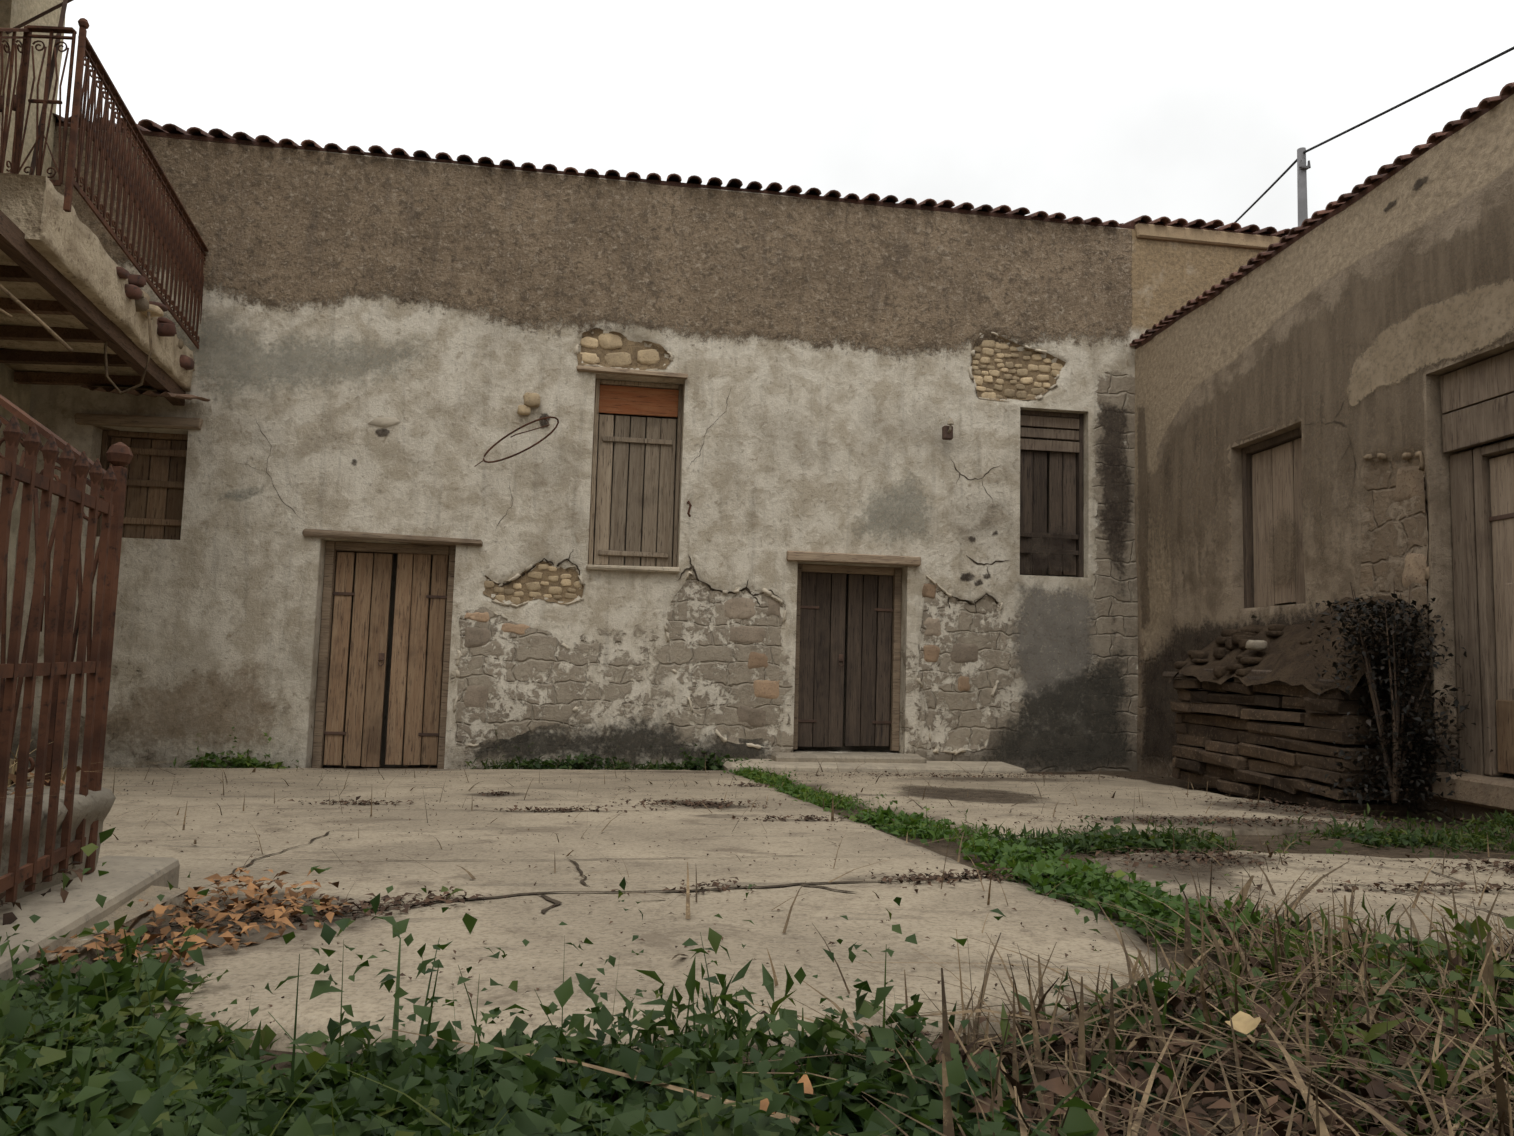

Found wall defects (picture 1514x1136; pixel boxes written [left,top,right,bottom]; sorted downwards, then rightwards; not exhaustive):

flaking render [49,127,1132,402]
damp [1137,197,1514,627]
peeling [453,561,589,748]
peeling [664,571,787,749]
peeling [917,573,1007,755]
damp [983,650,1131,770]
crack [177,808,351,882]
crack [154,855,1043,928]